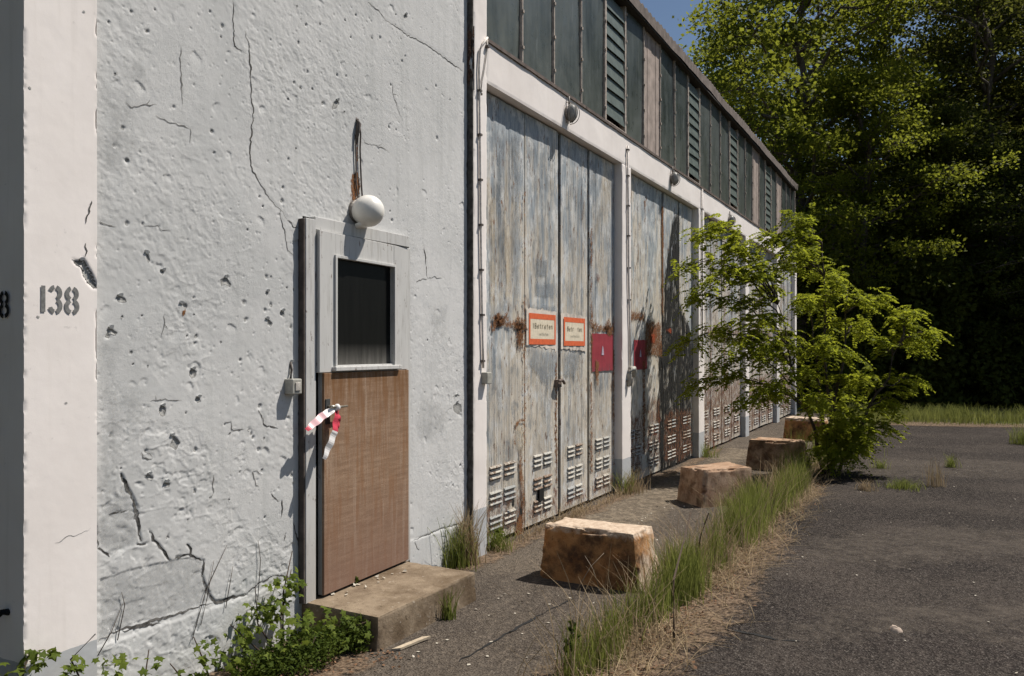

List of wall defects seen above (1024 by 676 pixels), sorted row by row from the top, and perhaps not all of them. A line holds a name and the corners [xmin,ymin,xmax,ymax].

crack [368,2,462,71]
crack [127,49,191,140]
crack [233,3,296,254]
rust [350,143,360,200]
spalling [74,257,97,288]
crack [226,410,276,431]
rust [486,228,615,536]
rust [631,207,792,476]
crack [252,470,298,541]
crack [59,473,289,642]